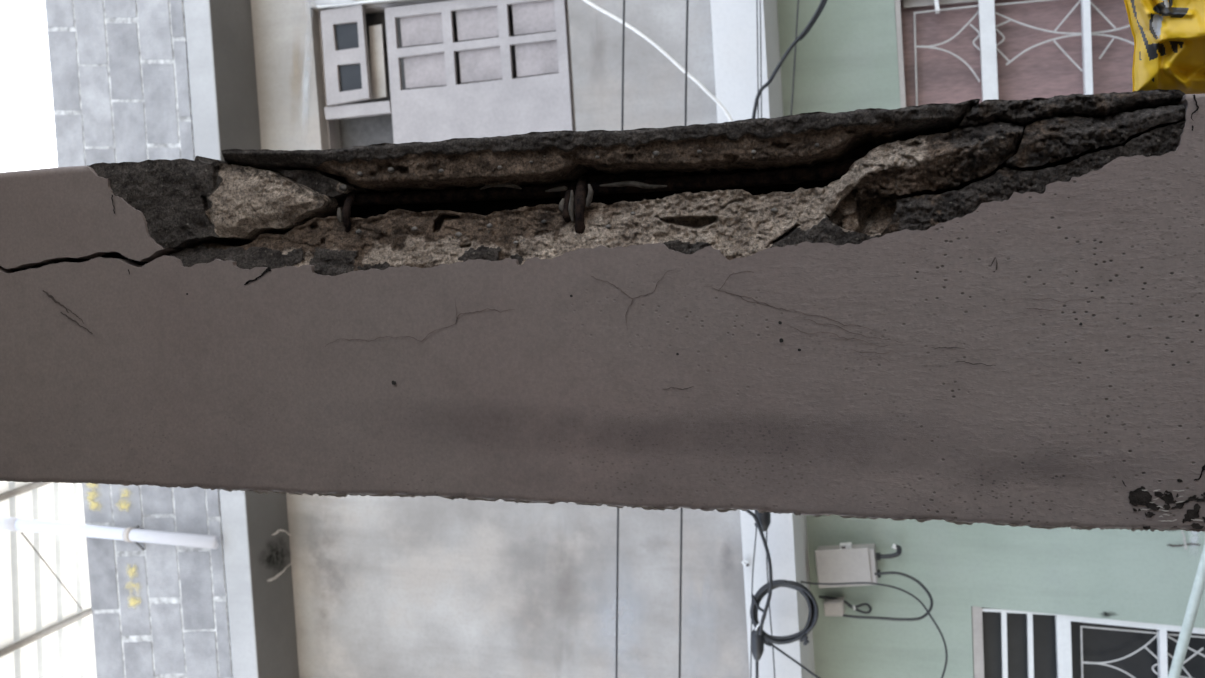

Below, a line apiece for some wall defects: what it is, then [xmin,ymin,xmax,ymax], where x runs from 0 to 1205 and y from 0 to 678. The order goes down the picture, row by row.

spalling [89,89,1185,276]
crack [10,253,165,275]
spalling [211,489,419,498]
spalling [439,496,555,504]
spalling [574,502,973,525]
peeling [992,479,1205,550]